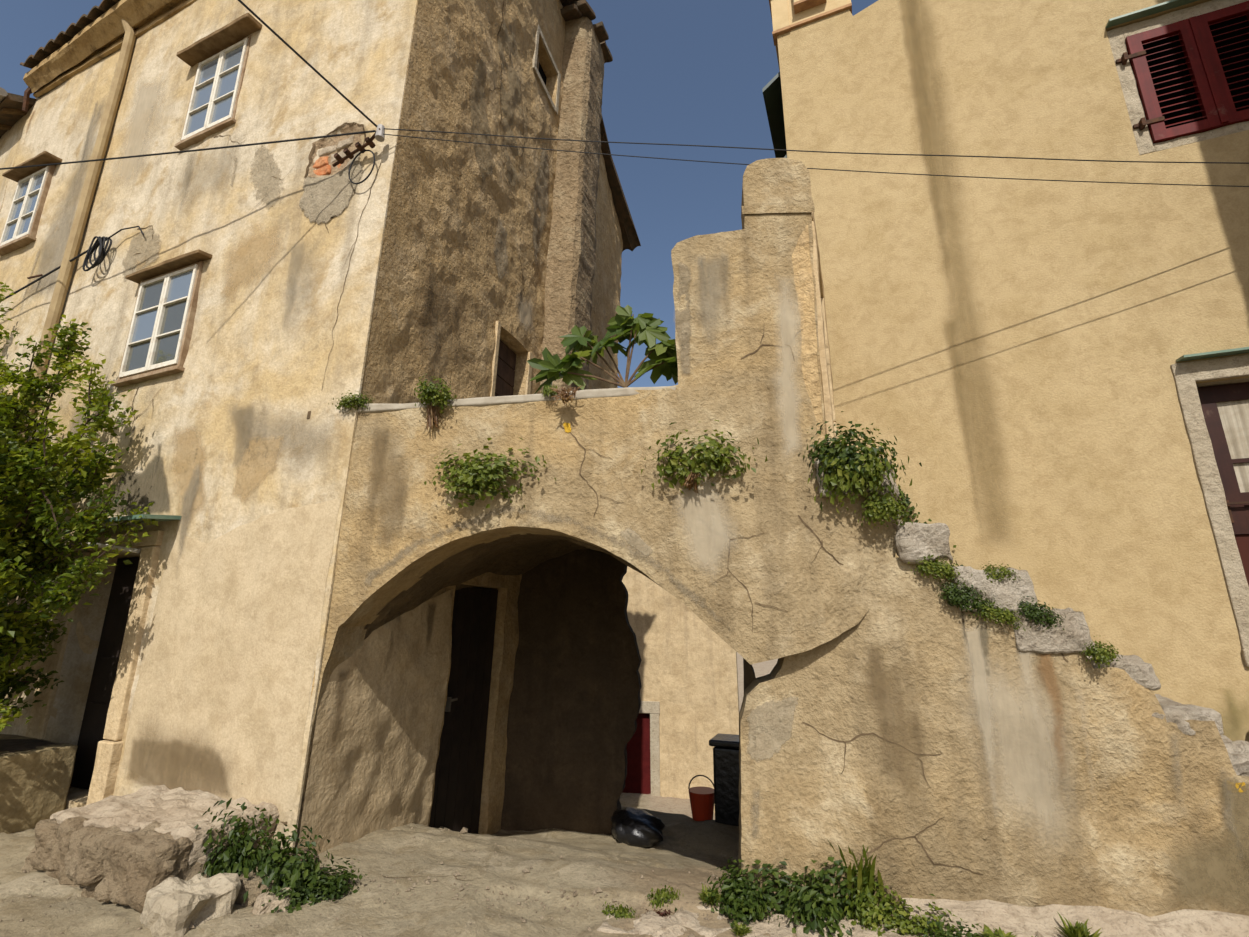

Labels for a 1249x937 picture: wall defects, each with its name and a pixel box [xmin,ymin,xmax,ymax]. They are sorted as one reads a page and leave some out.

flaking render [231,146,283,209]
flaking render [299,122,366,224]
crack [802,721,941,788]
crack [855,817,983,875]